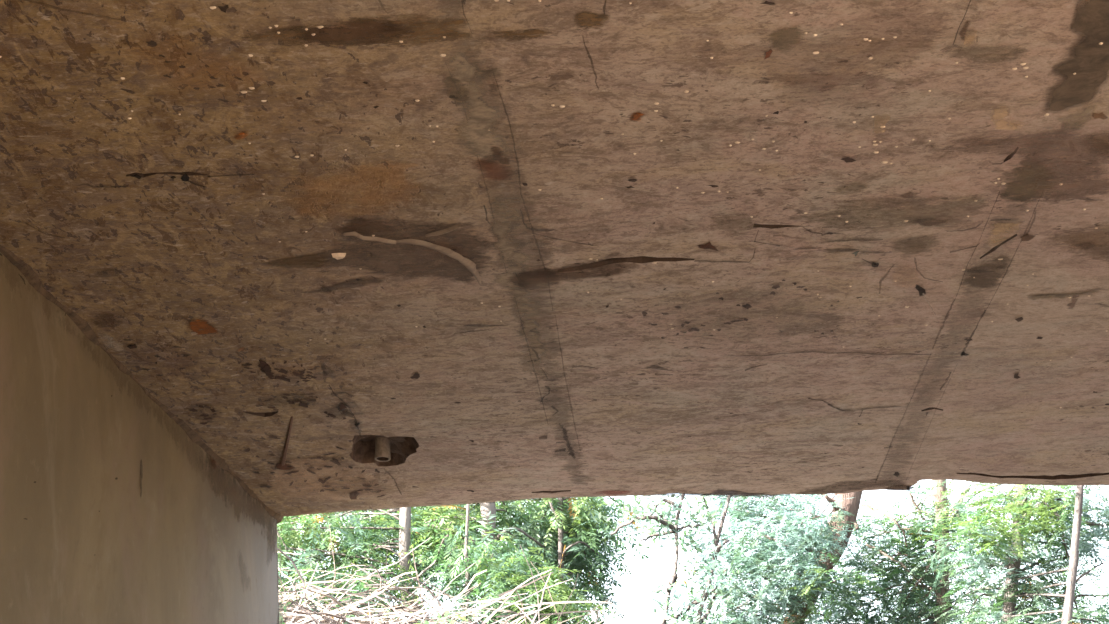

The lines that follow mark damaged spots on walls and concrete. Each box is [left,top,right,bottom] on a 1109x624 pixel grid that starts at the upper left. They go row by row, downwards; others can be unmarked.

water stain [241,17,471,46]
water stain [493,29,551,40]
water stain [575,12,608,30]
water stain [444,54,509,164]
water stain [932,0,1109,201]
water stain [266,197,633,375]
spalling [242,360,419,499]
crack [956,472,1109,480]